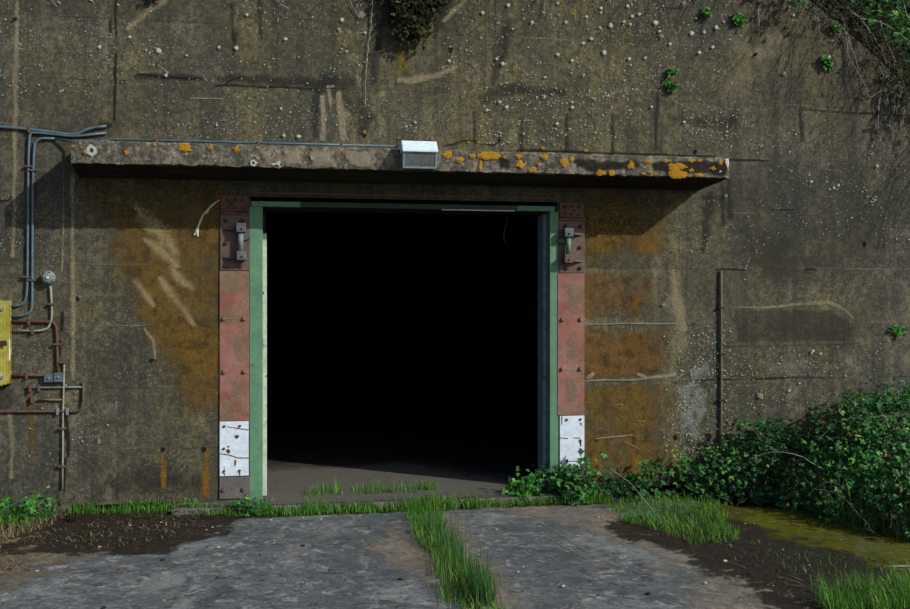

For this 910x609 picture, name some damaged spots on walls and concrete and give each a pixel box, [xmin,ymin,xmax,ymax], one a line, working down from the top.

water stain [492,21,566,95]
water stain [219,74,372,134]
corrosion [580,328,679,483]